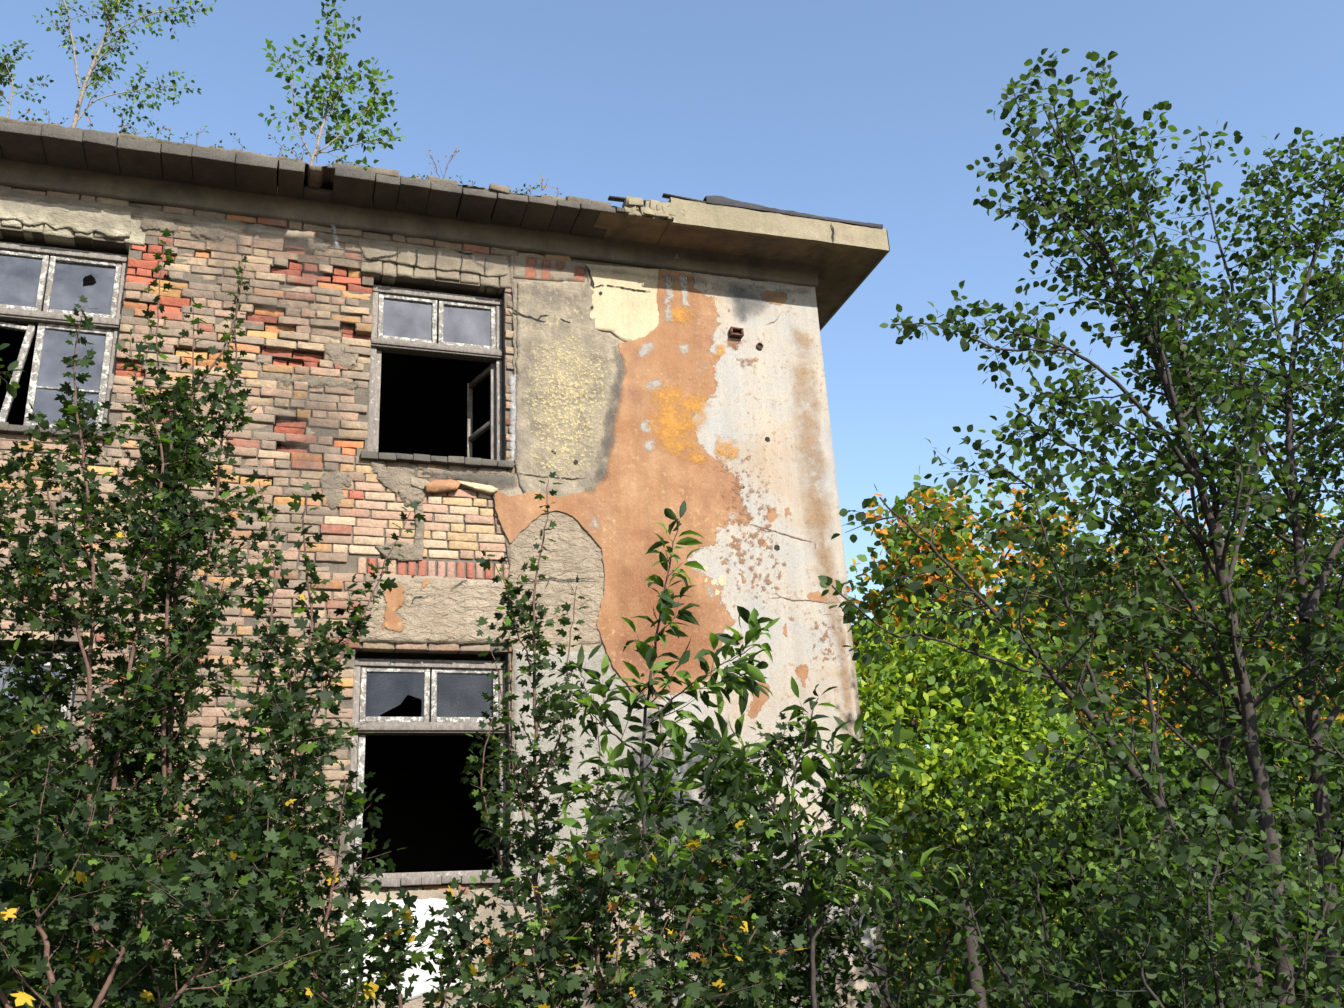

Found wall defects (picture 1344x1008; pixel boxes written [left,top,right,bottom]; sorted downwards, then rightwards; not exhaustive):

spalling [0,121,640,239]
peeling [274,255,790,908]